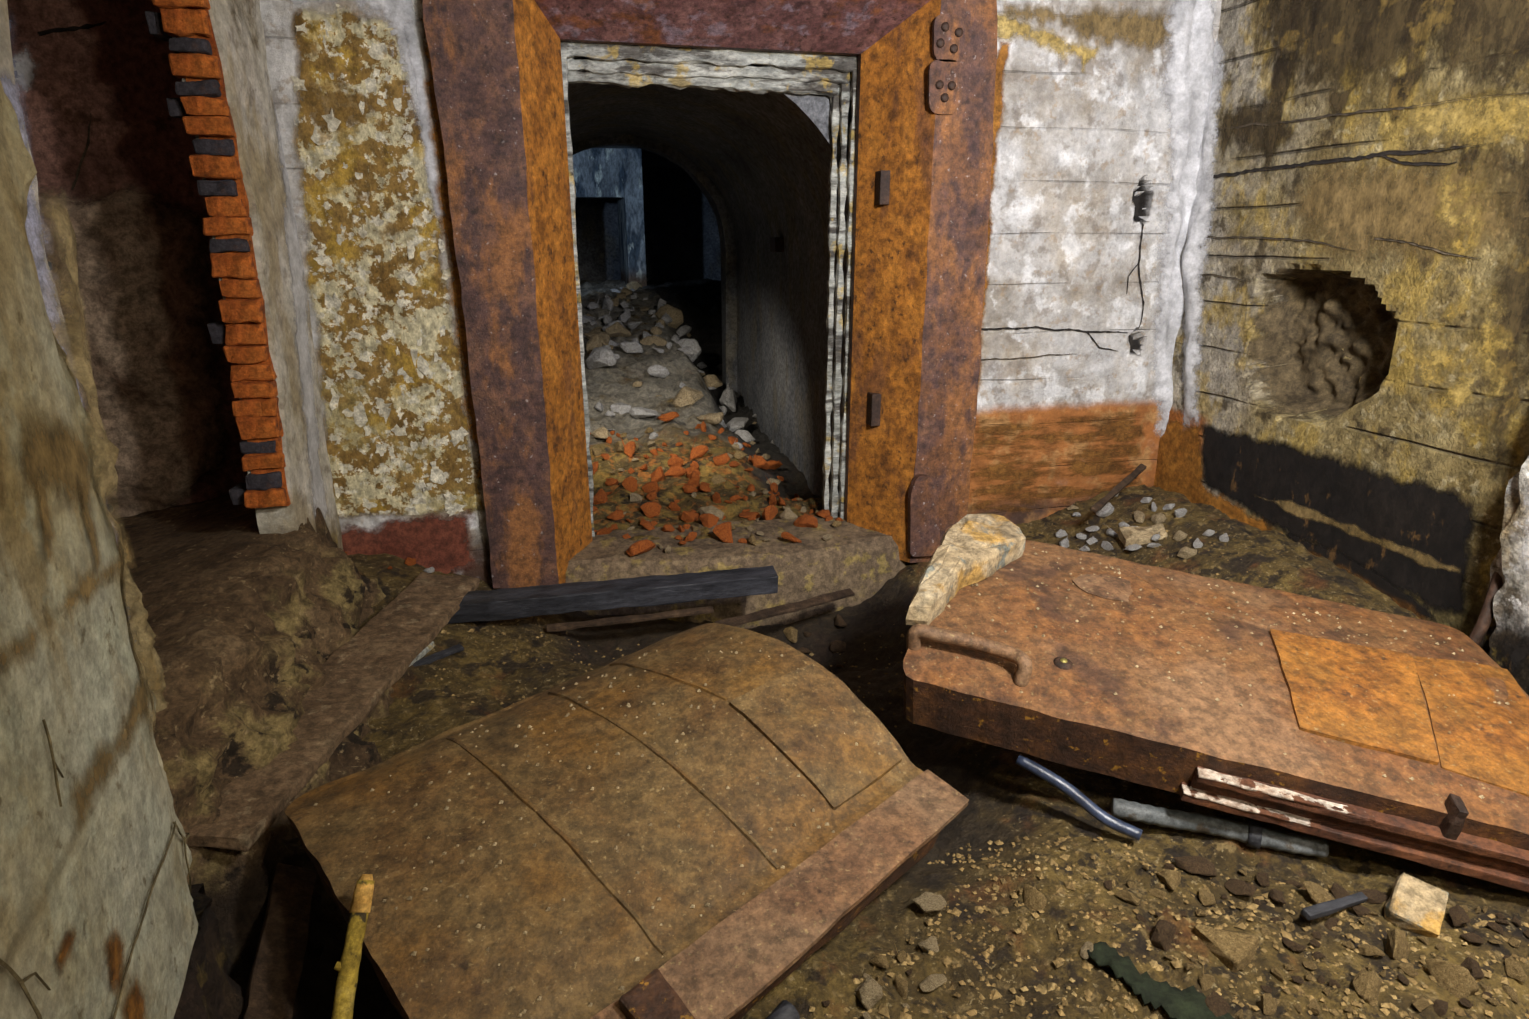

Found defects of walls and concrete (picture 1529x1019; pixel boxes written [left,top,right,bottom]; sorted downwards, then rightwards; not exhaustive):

water stain [275,107,327,517]
water stain [357,0,443,215]
corrosion [422,8,482,479]
water stain [1004,4,1174,48]
crack [1199,236,1482,281]
crack [1213,143,1494,178]
crack [1214,92,1529,131]
water stain [1218,0,1529,473]
water stain [21,419,132,610]
water stain [1287,533,1435,621]